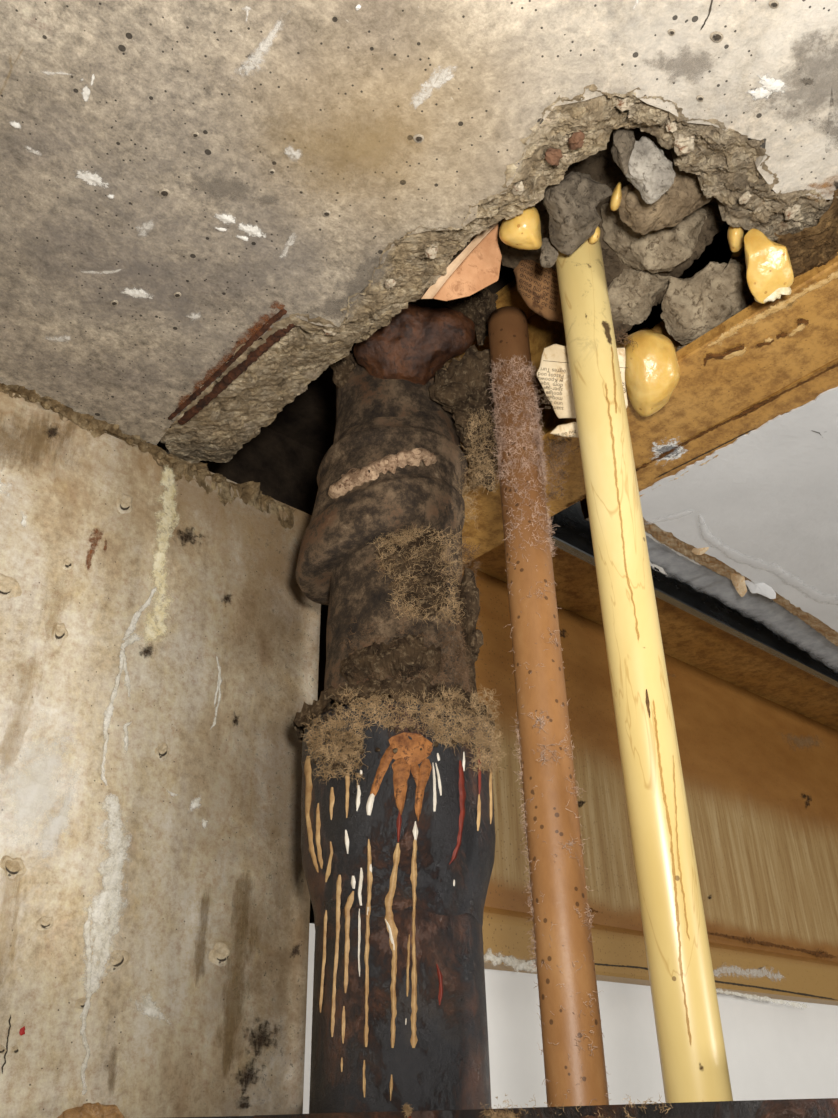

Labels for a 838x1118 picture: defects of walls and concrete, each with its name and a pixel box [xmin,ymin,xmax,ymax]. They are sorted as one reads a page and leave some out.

damp [789,36,838,115]
corrosion [178,303,285,408]
spalling [161,84,838,465]
damp [80,466,201,1094]